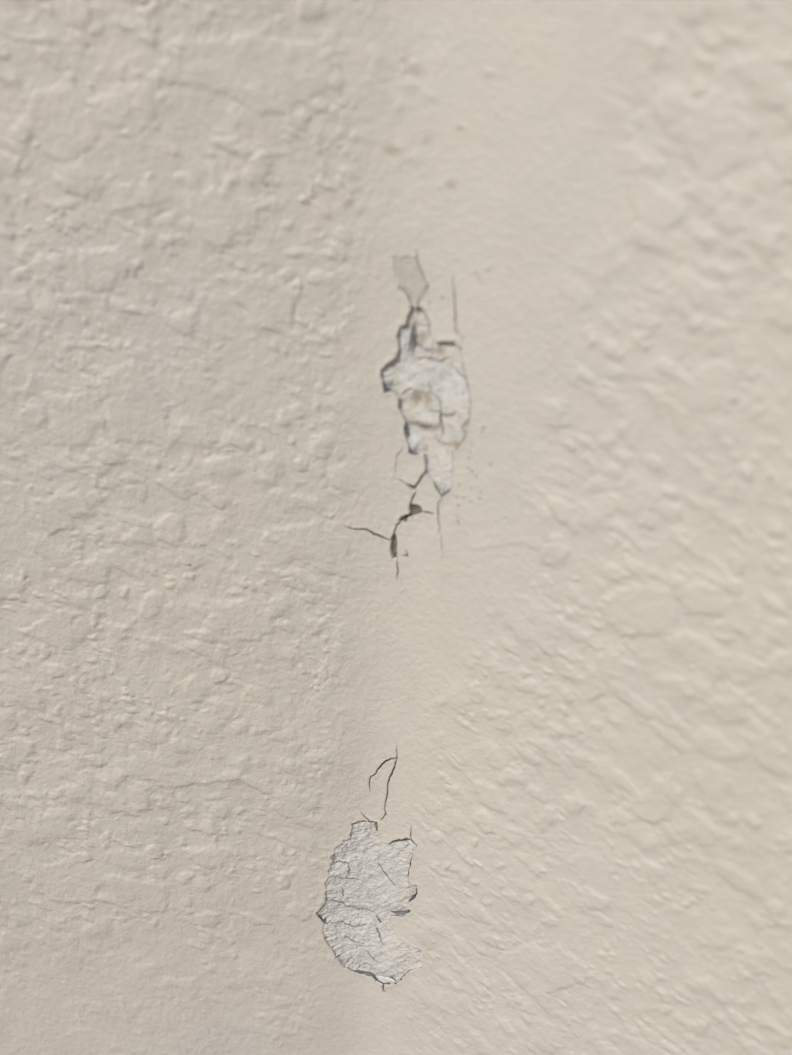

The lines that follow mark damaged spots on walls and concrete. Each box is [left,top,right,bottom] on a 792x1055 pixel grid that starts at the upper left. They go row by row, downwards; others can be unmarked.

spalling [382,250,471,498]
crack [344,462,442,576]
crack [363,758,397,832]
spalling [317,820,423,985]